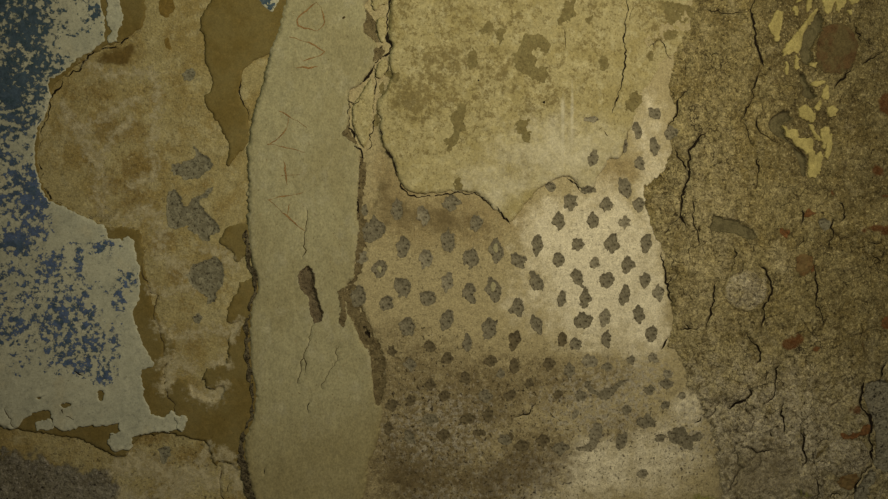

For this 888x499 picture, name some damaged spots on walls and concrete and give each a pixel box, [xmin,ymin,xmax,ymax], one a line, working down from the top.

spalling [363,9,385,62]
peeling [512,33,550,83]
crack [834,17,879,88]
peeling [444,103,466,152]
crack [667,89,688,128]
crack [707,0,779,188]
peeling [0,0,188,452]
crack [660,133,706,302]
flaking render [643,0,888,499]
spalling [298,265,324,323]
crack [662,248,886,499]
flaking render [0,446,121,499]